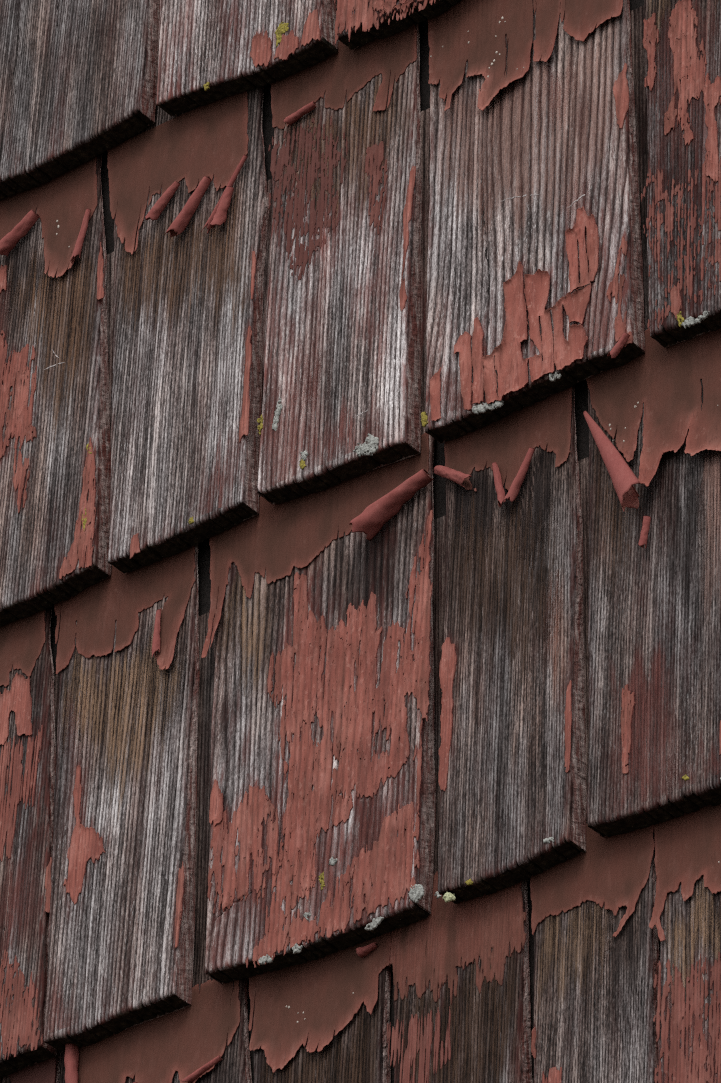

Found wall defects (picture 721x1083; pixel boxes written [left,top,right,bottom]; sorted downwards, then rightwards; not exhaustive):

peeling [0,330,37,514]
peeling [0,90,249,294]
peeling [239,326,252,443]
peeling [250,9,321,68]
peeling [268,0,623,280]
peeling [454,206,599,411]
peeling [583,0,721,549]
peeling [0,386,721,1083]